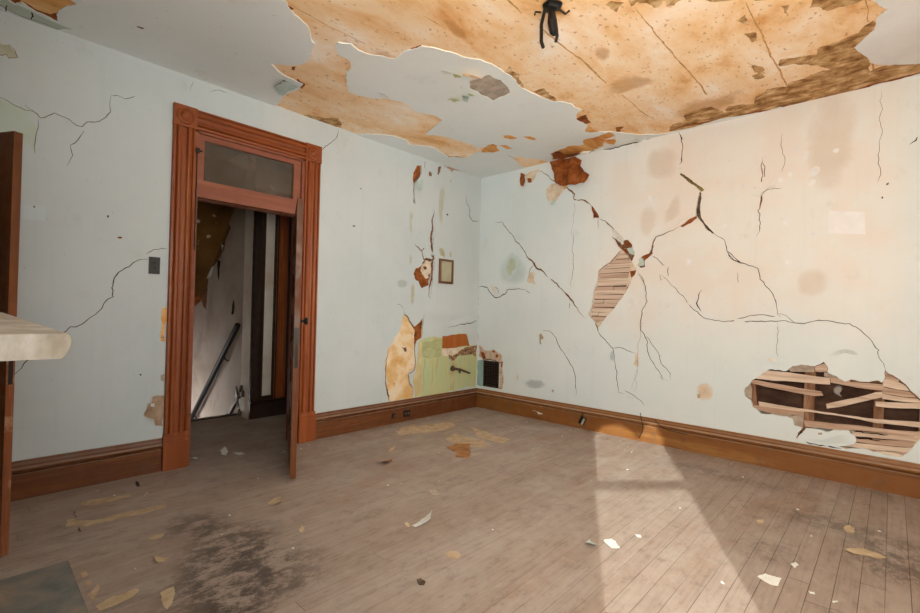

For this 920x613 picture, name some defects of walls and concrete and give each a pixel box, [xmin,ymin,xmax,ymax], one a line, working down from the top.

damp [440,16,471,43]
peeling [855,0,920,65]
peeling [0,97,40,153]
flaking render [441,70,510,103]
damp [602,72,660,96]
damp [665,84,753,123]
damp [798,89,868,207]
crack [65,248,165,332]
flaking render [414,260,431,288]
flaking render [612,229,653,289]
crack [448,133,886,405]
peeling [385,314,504,401]